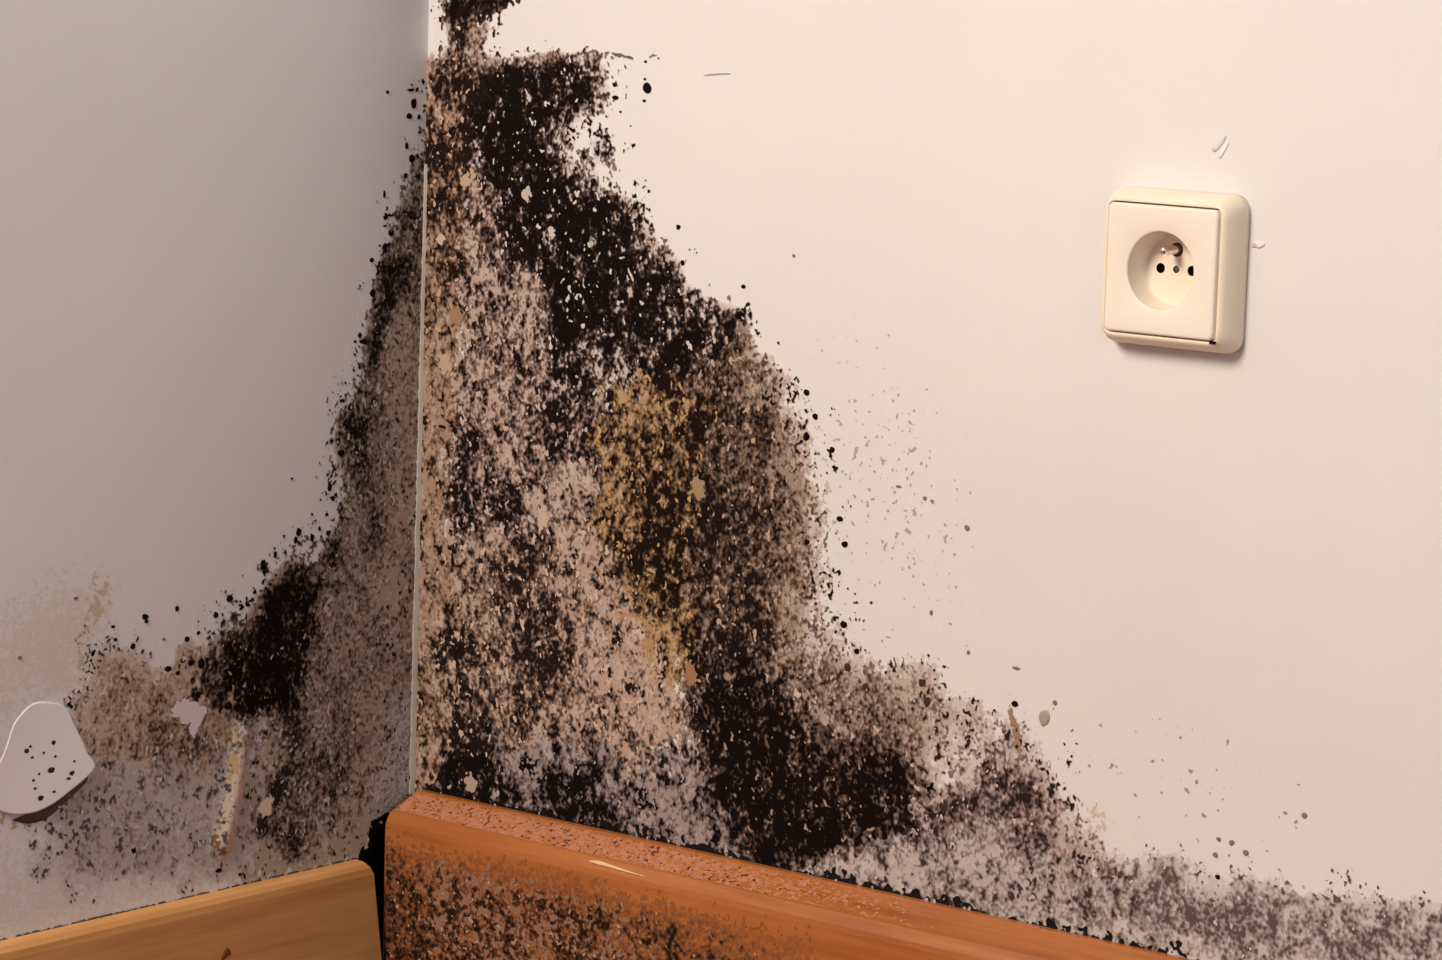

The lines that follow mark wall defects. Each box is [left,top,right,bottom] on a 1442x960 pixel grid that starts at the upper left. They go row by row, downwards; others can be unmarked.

damp [841,485,906,523]
damp [877,508,927,561]
damp [1039,710,1050,726]
peeling [0,702,96,815]
mould [384,831,817,960]